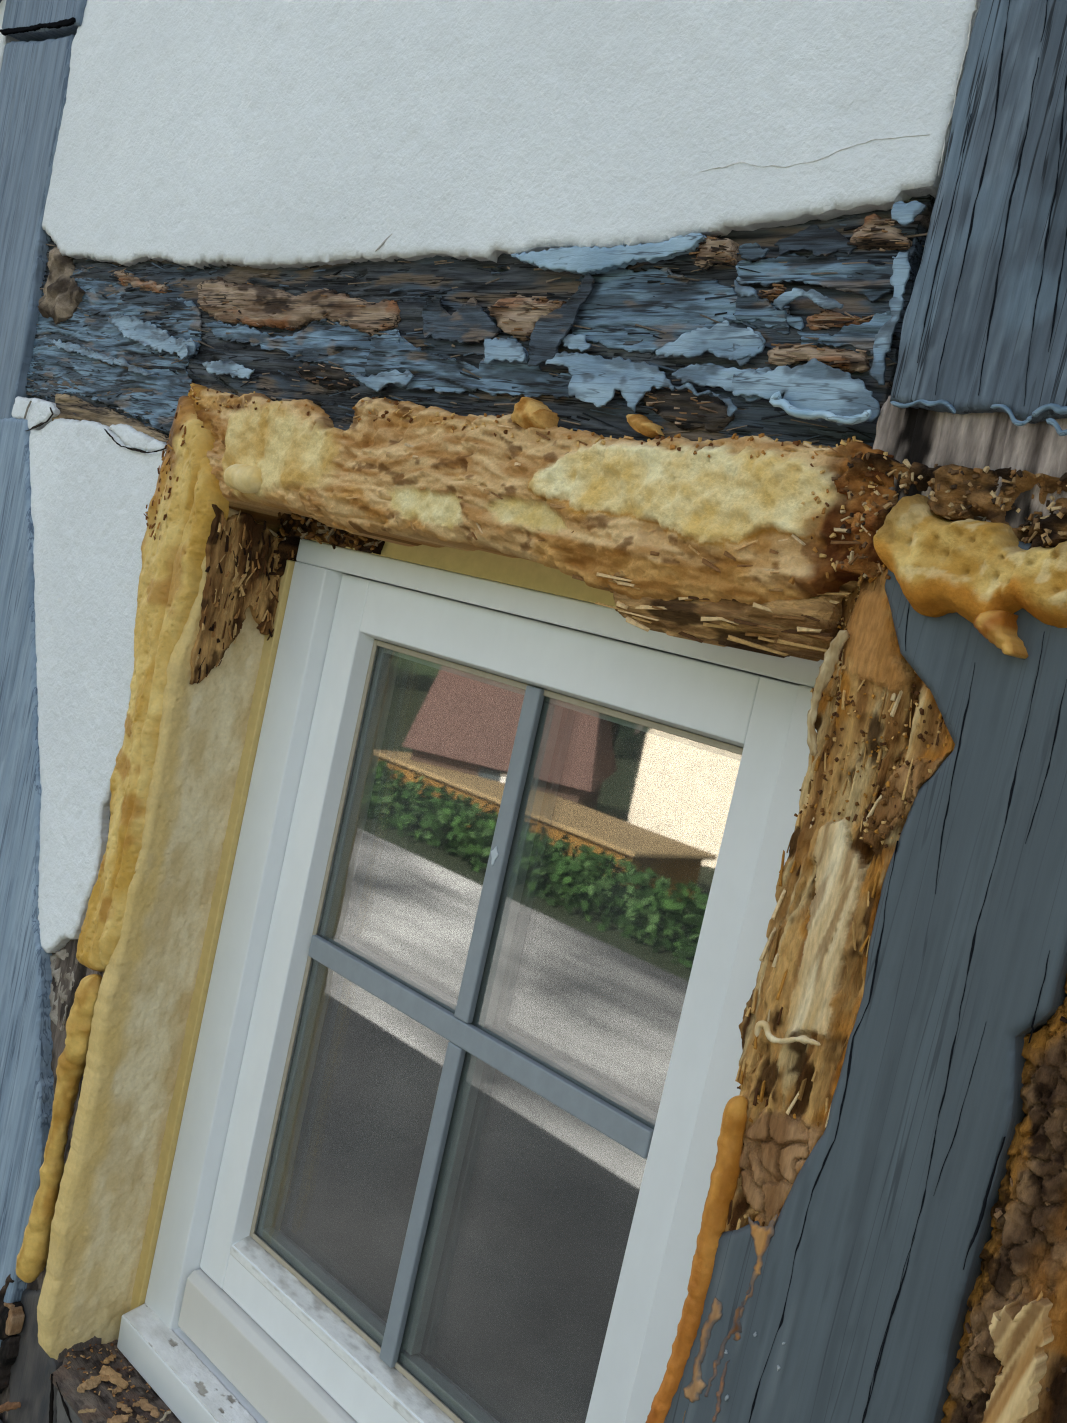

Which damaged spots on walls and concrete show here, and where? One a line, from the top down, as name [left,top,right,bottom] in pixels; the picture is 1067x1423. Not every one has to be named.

peeling [12,201,956,452]
crack [701,0,1067,404]
peeling [990,403,1067,436]
peeling [124,1304,257,1423]